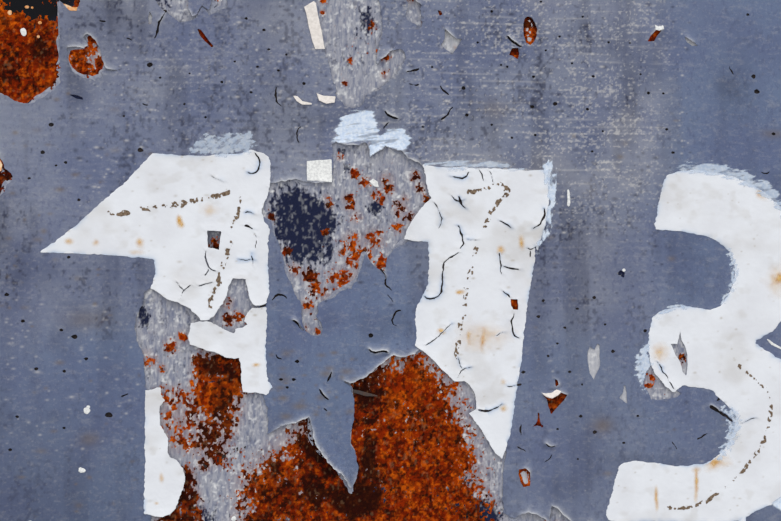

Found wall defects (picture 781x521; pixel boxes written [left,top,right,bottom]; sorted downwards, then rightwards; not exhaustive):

peeling [293,0,406,108]
peeling [0,159,13,195]
peeling [179,231,221,293]
peeling [262,142,435,336]
crack [424,170,493,300]
crack [496,209,546,338]
peeling [135,278,570,521]
peeling [644,367,680,400]
peeling [671,335,687,375]